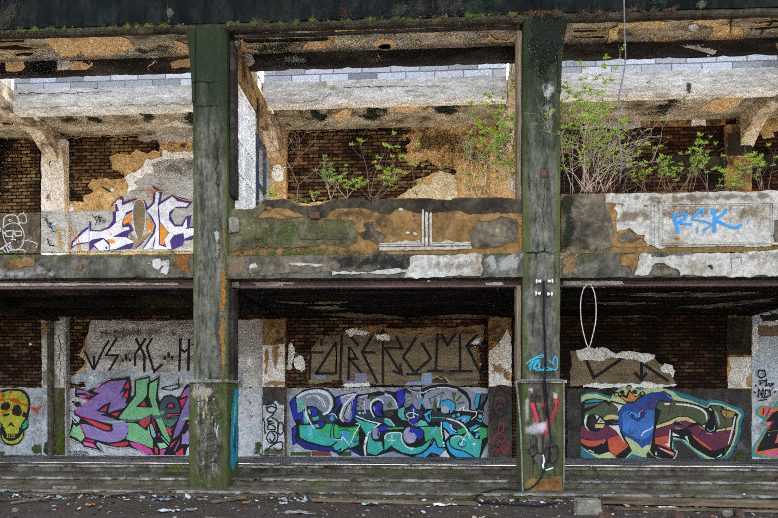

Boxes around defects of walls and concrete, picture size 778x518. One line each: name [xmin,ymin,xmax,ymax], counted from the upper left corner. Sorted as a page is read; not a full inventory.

peeling [0,37,134,75]
peeling [171,40,190,68]
damp [530,41,557,98]
flaking render [61,120,193,212]
flaking render [241,108,522,286]
peeling [560,193,778,278]
flaking render [277,301,500,389]
flaking render [563,281,778,389]
efflorescence [193,383,212,423]